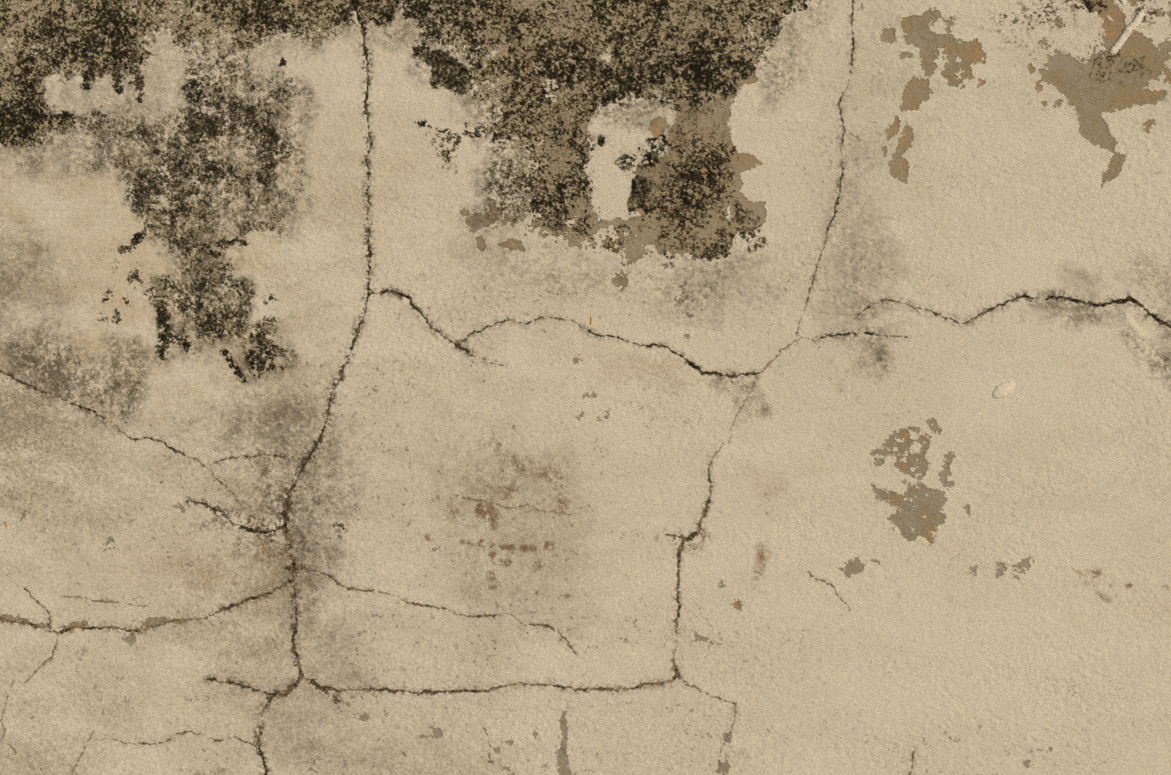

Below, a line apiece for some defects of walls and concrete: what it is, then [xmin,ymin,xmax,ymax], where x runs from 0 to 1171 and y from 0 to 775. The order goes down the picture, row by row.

water stain [0,0,811,415]
peeling [460,0,786,291]
peeling [880,7,986,183]
peeling [1028,0,1171,188]
crack [0,0,908,775]
peeling [870,418,955,543]
crack [857,293,1171,328]
peeling [542,711,571,775]